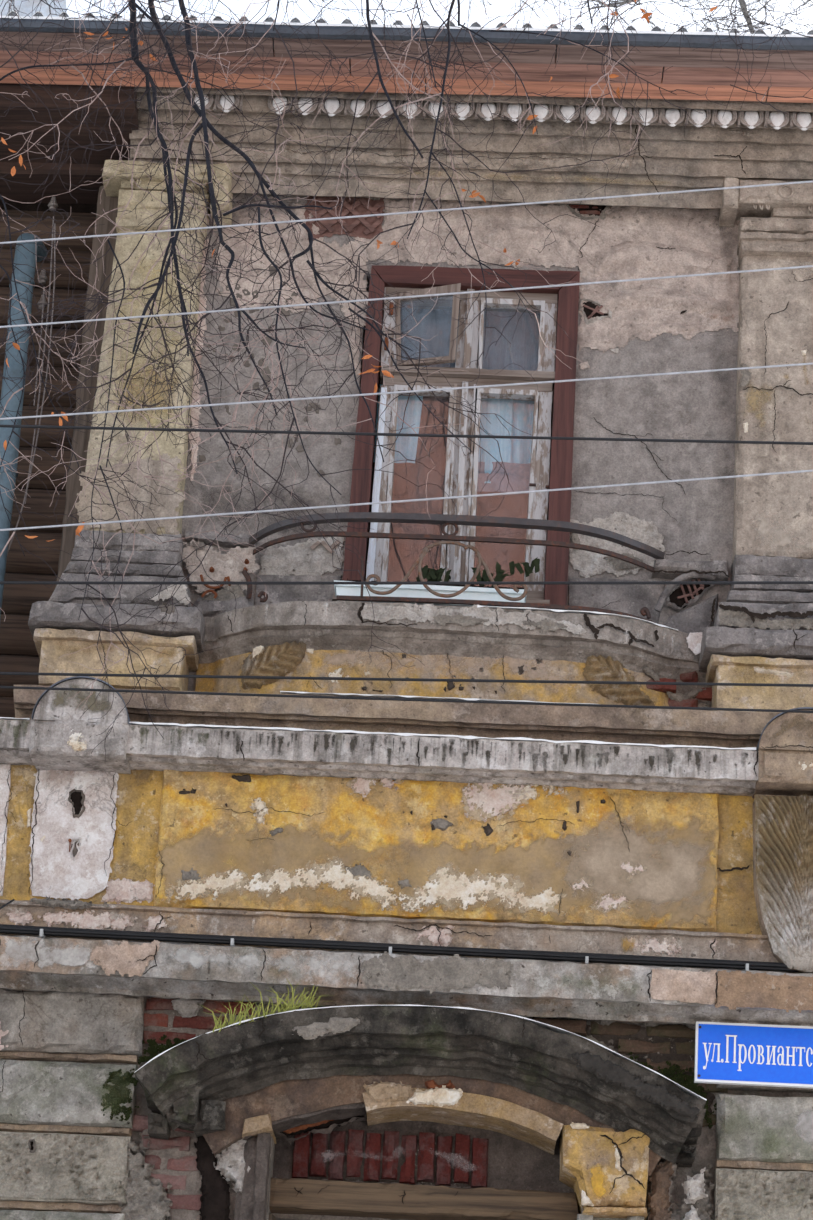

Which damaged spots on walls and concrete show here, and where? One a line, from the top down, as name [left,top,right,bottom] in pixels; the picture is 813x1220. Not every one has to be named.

peeling [75,196,740,605]
crack [576,417,686,520]
crack [583,601,659,647]
crack [654,551,813,650]
water stain [133,727,298,754]
water stain [314,734,496,765]
water stain [505,742,628,772]
peeling [5,770,589,977]
peeling [333,925,513,993]
spalling [292,1017,360,1040]
spalling [274,1079,463,1141]
crack [600,1134,646,1193]